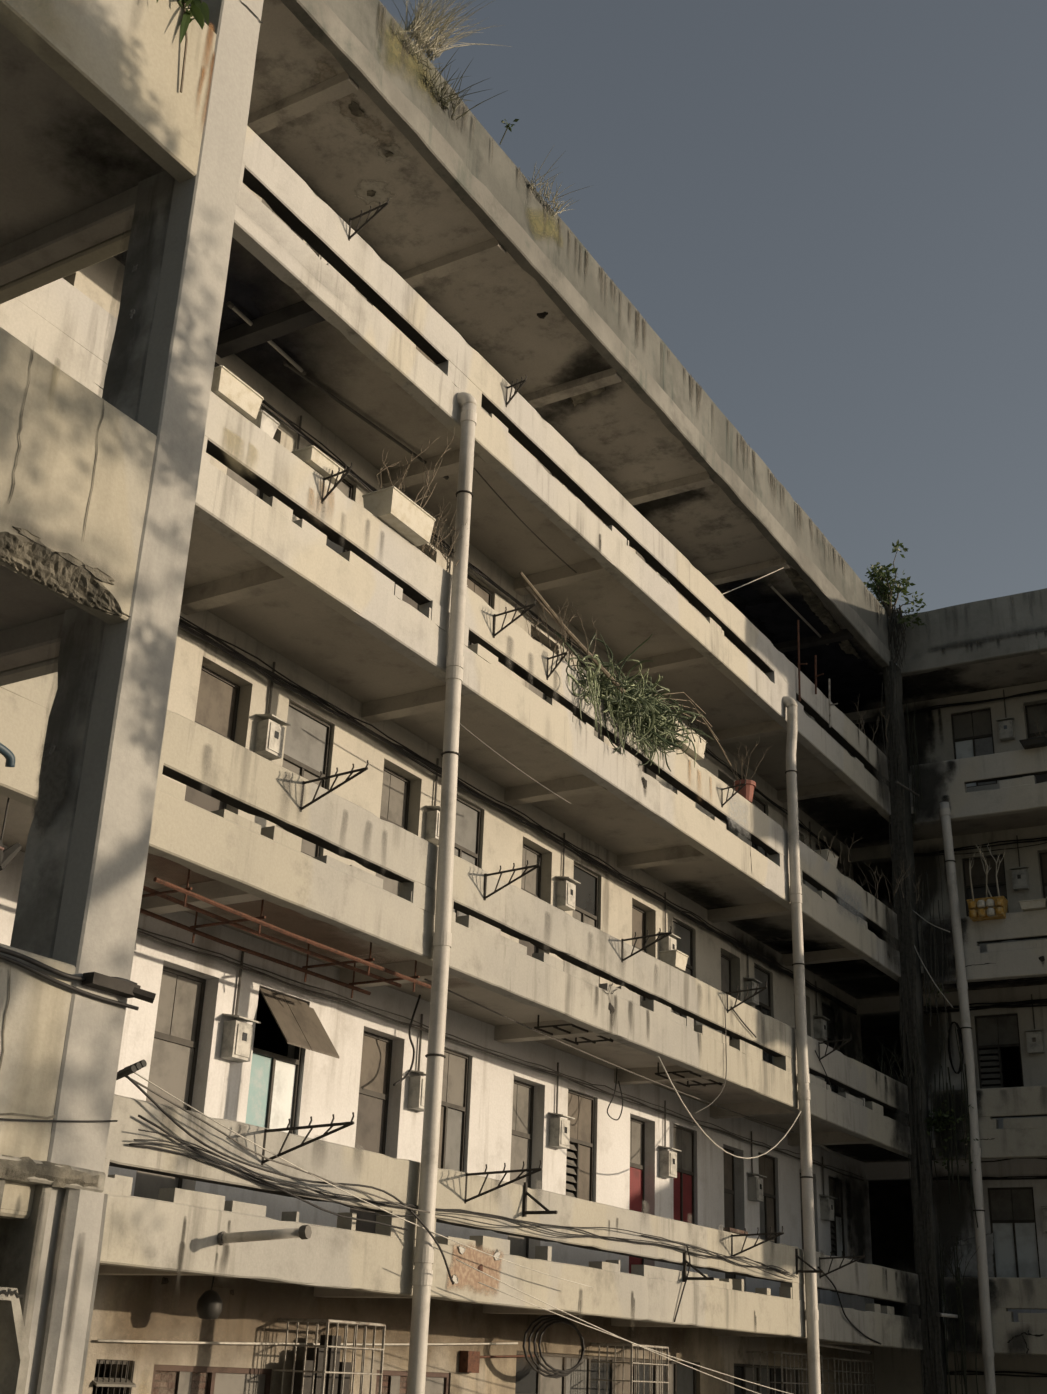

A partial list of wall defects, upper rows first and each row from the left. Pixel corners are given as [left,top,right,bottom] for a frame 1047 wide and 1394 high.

crack [9,345,34,503]
spalling [0,526,131,617]
water stain [734,593,891,878]
water stain [902,627,1047,823]
water stain [675,883,900,1061]
water stain [914,849,1047,990]
water stain [836,1177,869,1264]
water stain [823,1072,911,1161]
water stain [923,1009,997,1353]
water stain [885,1268,923,1349]